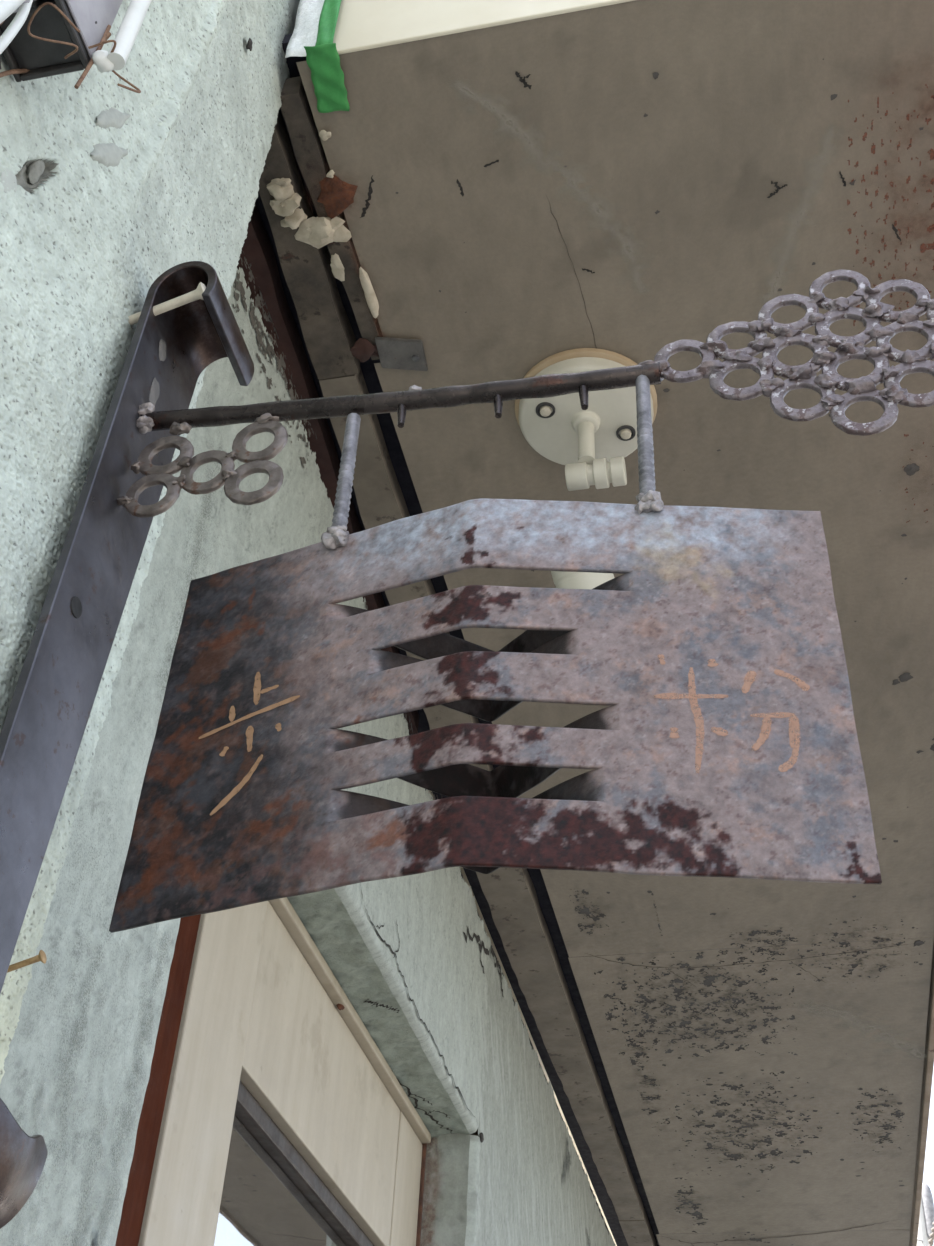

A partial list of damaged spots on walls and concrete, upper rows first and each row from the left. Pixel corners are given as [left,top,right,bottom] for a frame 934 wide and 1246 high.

flaking render [1,159,58,193]
peeling [360,175,374,218]
corrosion [847,84,934,310]
crack [360,883,475,1134]
crack [662,1221,888,1246]